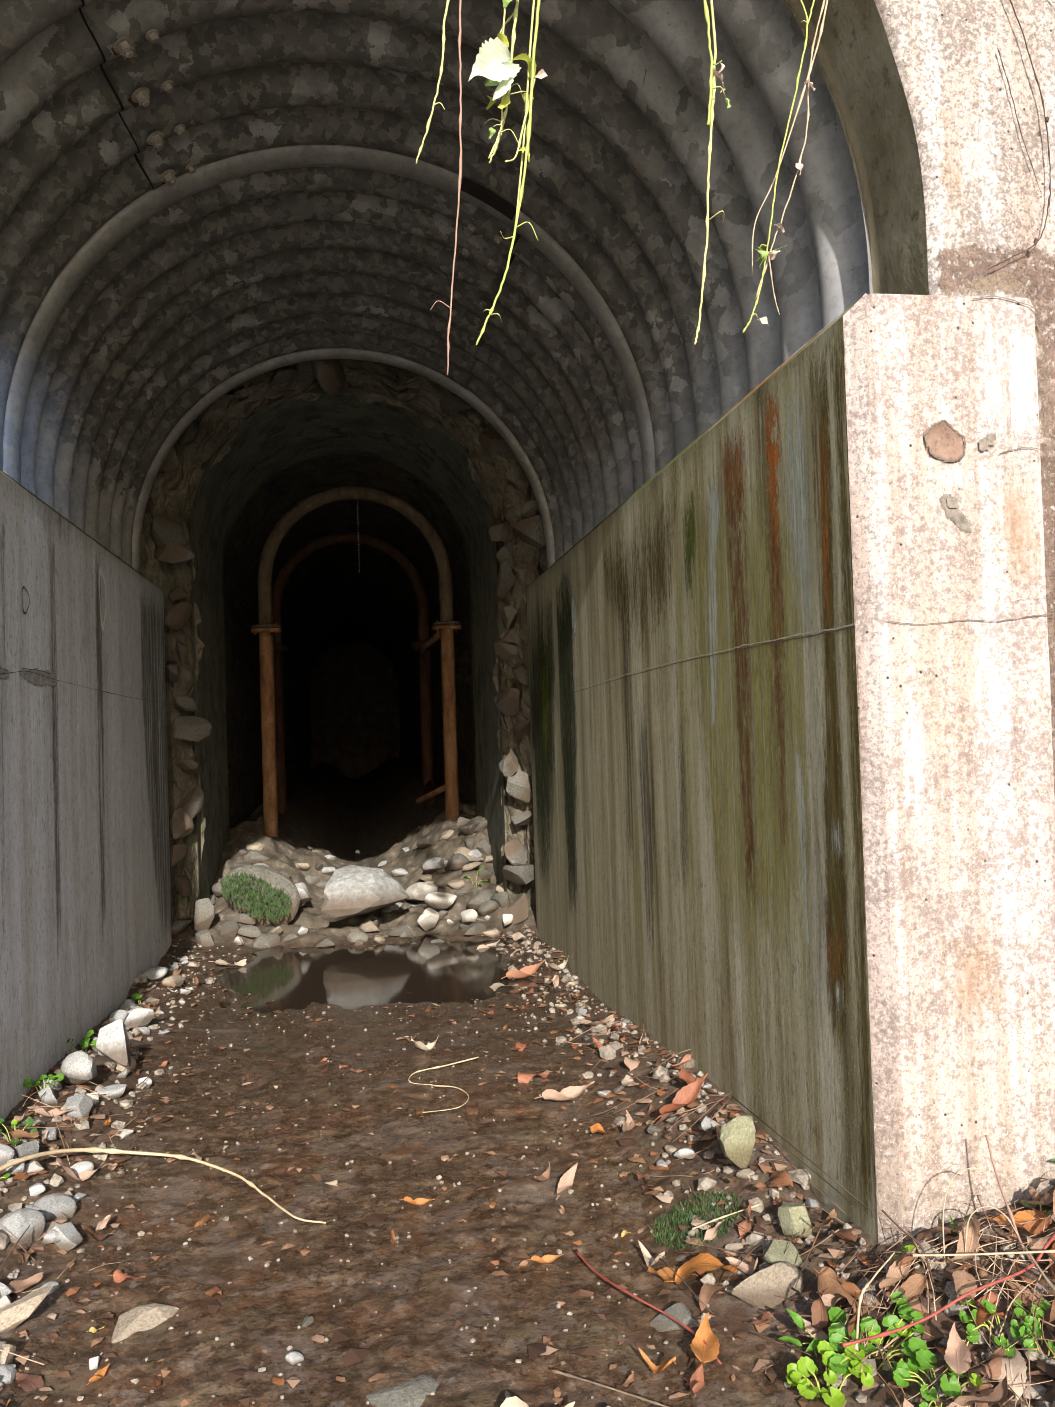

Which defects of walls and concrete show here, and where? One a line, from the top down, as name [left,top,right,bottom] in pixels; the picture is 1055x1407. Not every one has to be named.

crack [1,668,163,703]
leakage [556,575,577,907]
leakage [623,614,654,938]
leakage [708,483,719,724]
corrosion [718,327,847,1048]
leakage [788,402,809,615]
leakage [797,757,809,941]
crack [573,598,1054,693]
leakage [831,345,877,1216]
spalling [940,494,972,533]
spalling [923,420,996,463]
leakage [936,243,1055,794]